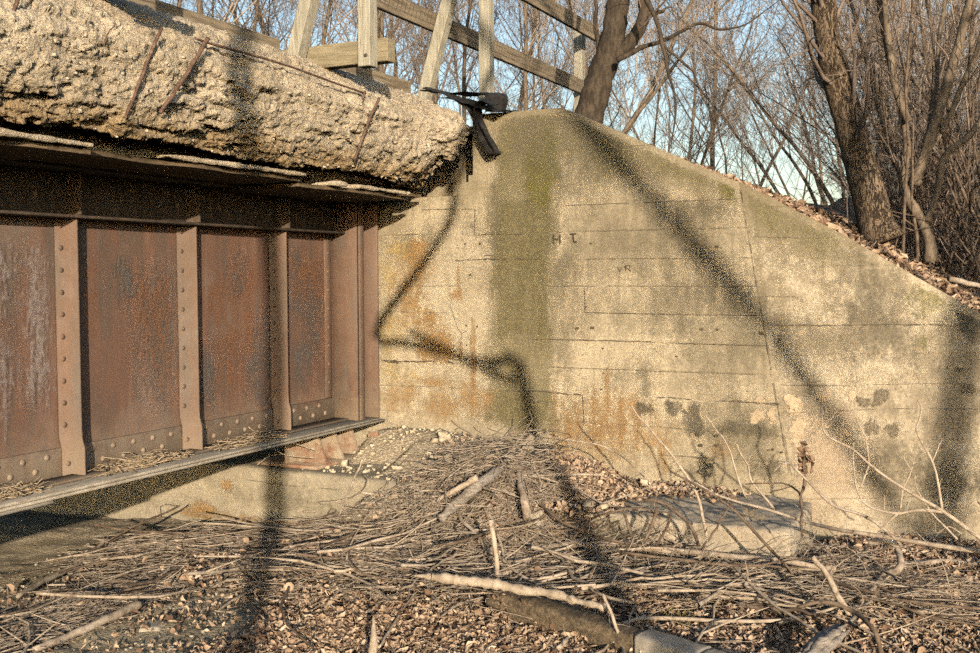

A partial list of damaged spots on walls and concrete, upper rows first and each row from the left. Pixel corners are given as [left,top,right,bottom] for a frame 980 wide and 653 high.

spalling [0,0,470,192]
corrosion [417,309,461,363]
peeling [750,393,851,453]